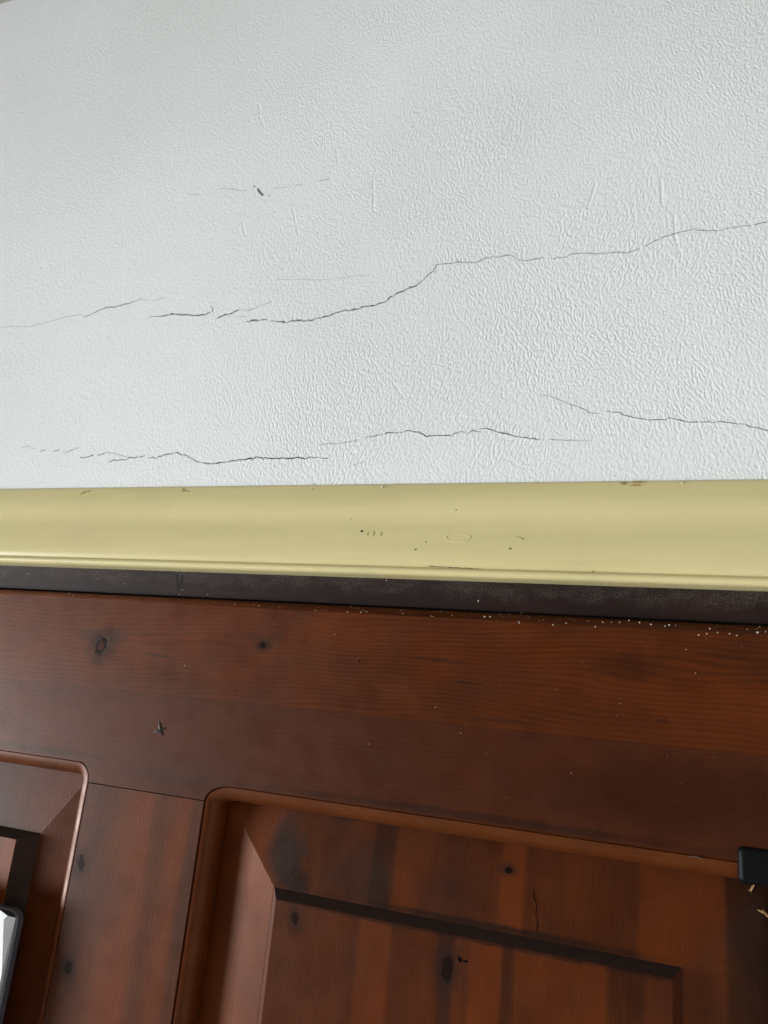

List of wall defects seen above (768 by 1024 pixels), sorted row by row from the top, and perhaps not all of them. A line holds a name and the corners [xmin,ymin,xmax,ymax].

crack [2,222,766,328]
crack [544,395,768,432]
crack [25,428,579,467]